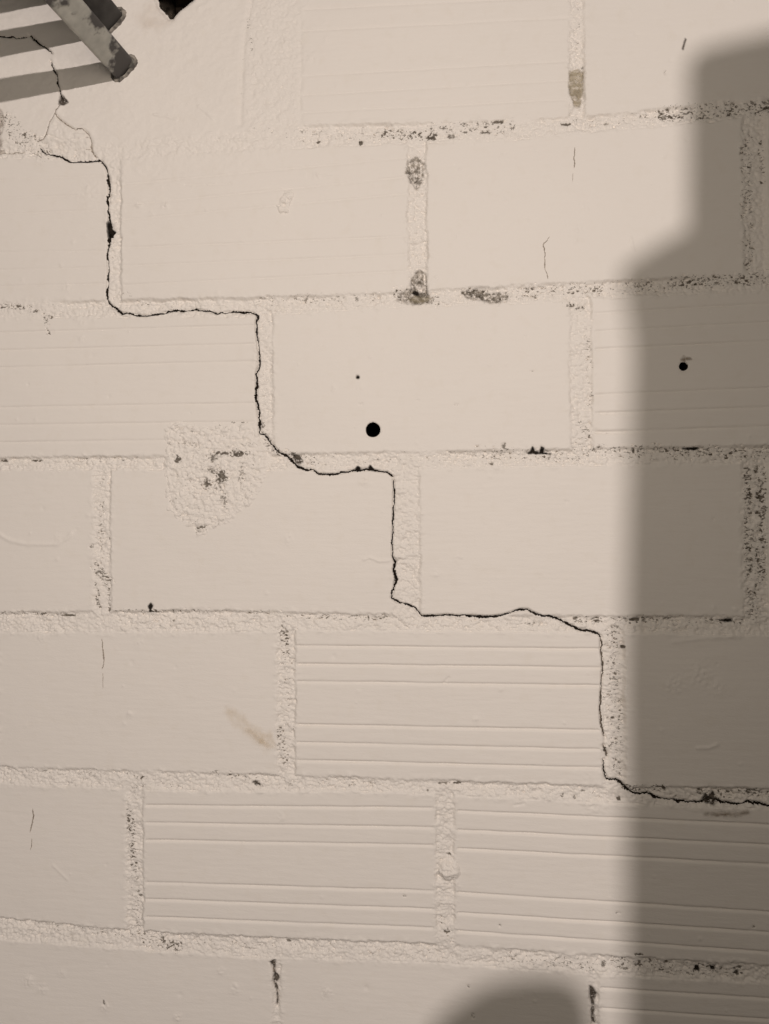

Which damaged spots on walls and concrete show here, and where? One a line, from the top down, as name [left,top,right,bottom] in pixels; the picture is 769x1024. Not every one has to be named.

crack [0,35,769,807]